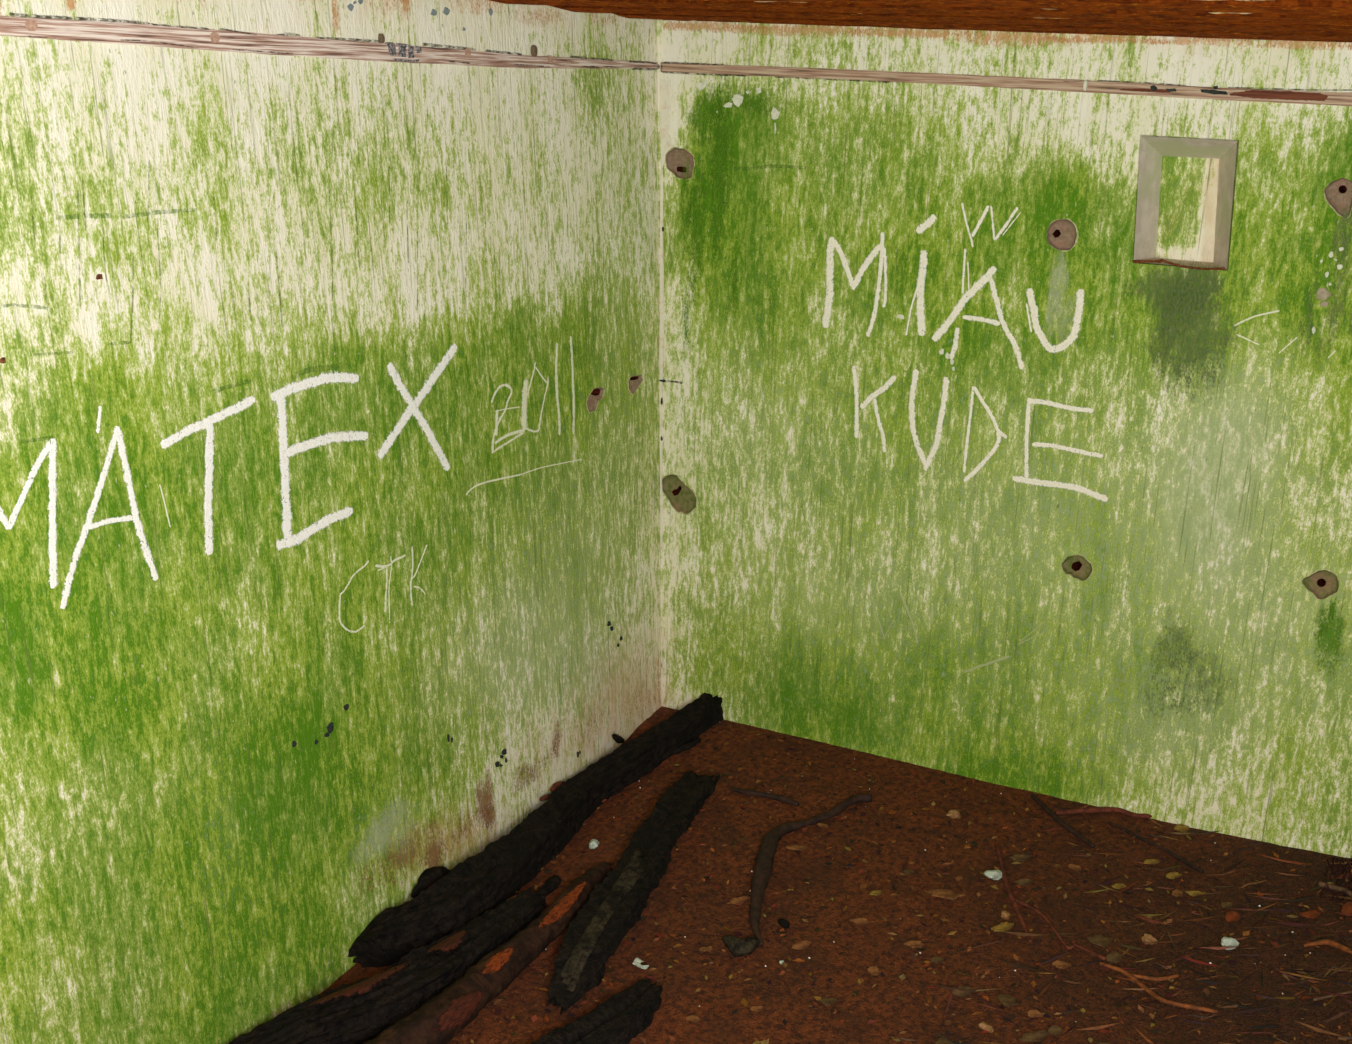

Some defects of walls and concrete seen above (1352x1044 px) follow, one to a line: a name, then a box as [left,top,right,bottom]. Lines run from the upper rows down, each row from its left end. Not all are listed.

water stain [385,42,421,62]
water stain [1137,268,1229,388]
water stain [1316,599,1343,671]